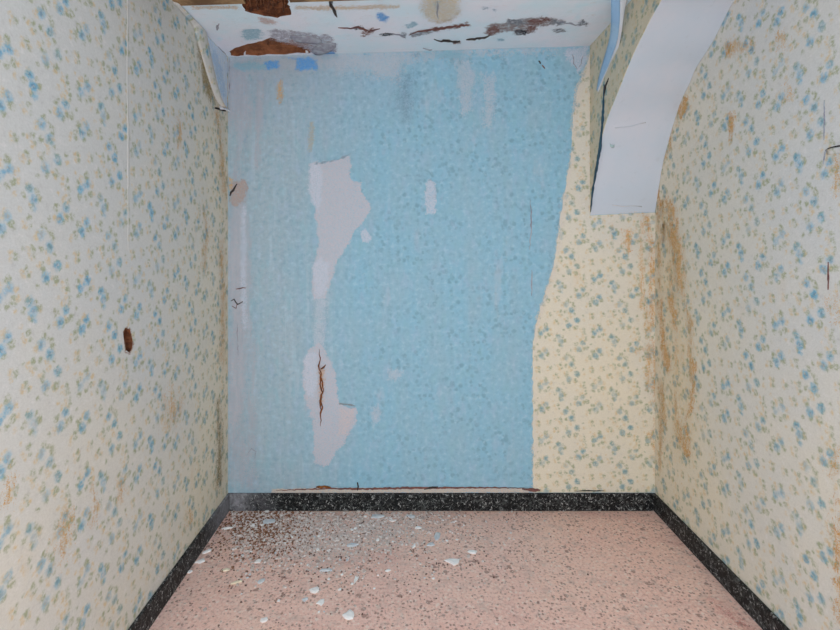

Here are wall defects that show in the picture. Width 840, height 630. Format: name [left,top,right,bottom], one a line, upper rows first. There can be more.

flaking render [466,17,588,41]
peeling [300,153,372,467]
spalling [123,326,134,354]
crack [317,349,326,426]
flaking render [271,482,540,493]